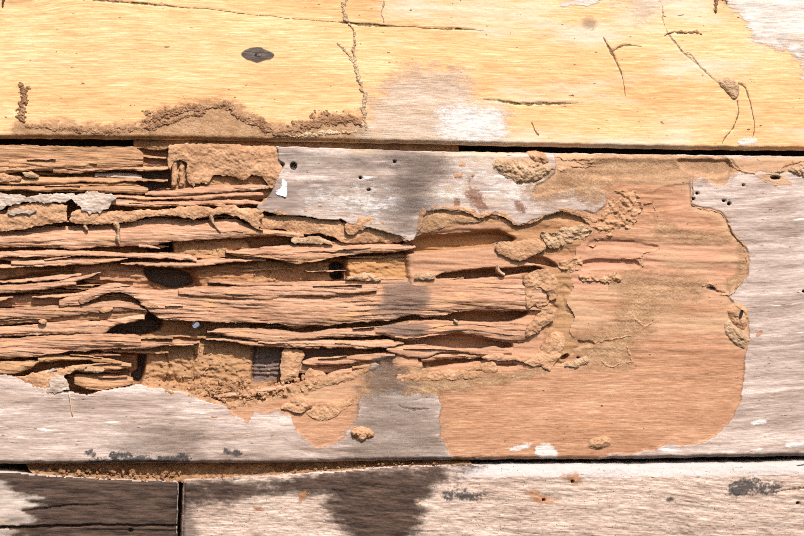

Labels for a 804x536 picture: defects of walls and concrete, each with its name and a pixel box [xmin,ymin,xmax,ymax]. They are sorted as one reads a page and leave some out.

crack [93,0,475,30]
peeling [226,153,804,459]
water stain [0,465,487,536]